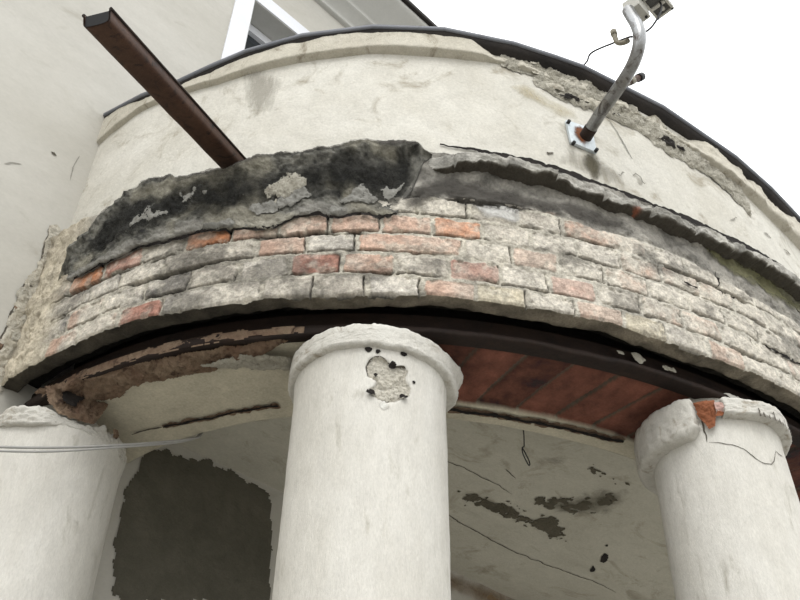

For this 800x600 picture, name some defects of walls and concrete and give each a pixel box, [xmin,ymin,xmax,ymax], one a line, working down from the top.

flaking render [500,54,607,111]
leakage [89,139,416,251]
flaking render [606,99,752,217]
flaking render [0,224,61,394]
flaking render [34,339,292,424]
crack [132,403,281,435]
flaking render [365,347,415,403]
crack [701,420,783,465]
flaking render [111,449,273,600]
flaking render [457,464,618,542]